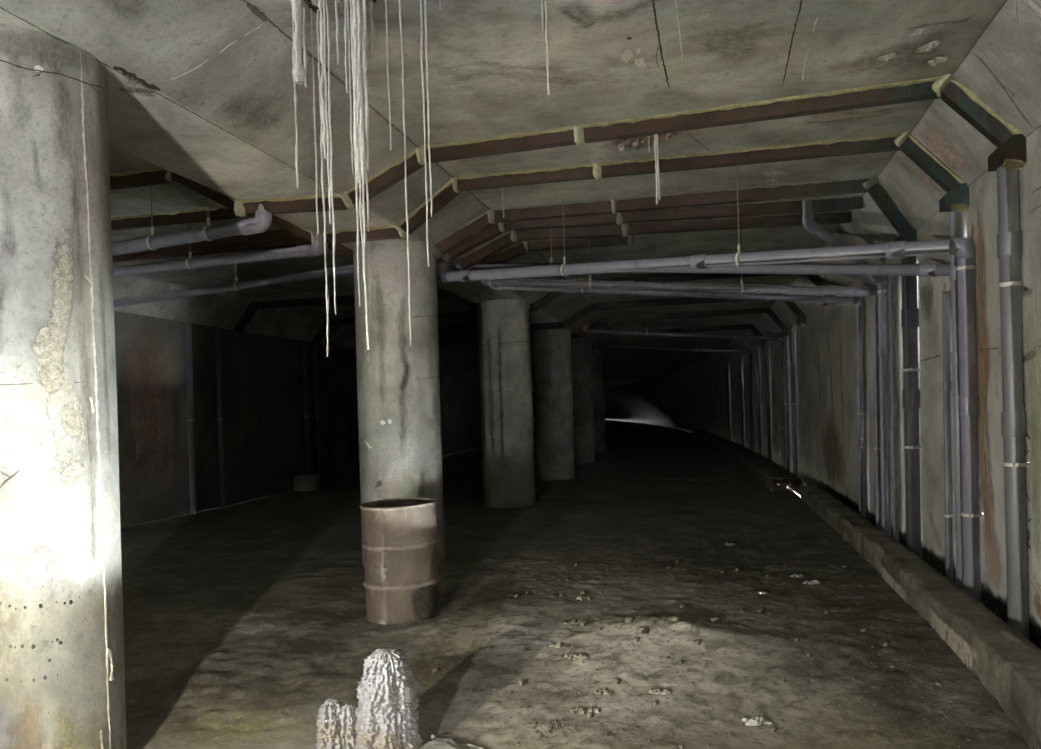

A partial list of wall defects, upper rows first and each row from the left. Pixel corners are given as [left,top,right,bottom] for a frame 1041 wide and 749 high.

crack [652,0,670,89]
crack [782,0,803,86]
crack [0,0,490,210]
damp [73,49,122,749]
rust [971,213,999,585]
damp [799,474,876,526]
damp [921,543,956,585]
damp [981,582,1008,624]
damp [1029,617,1041,650]